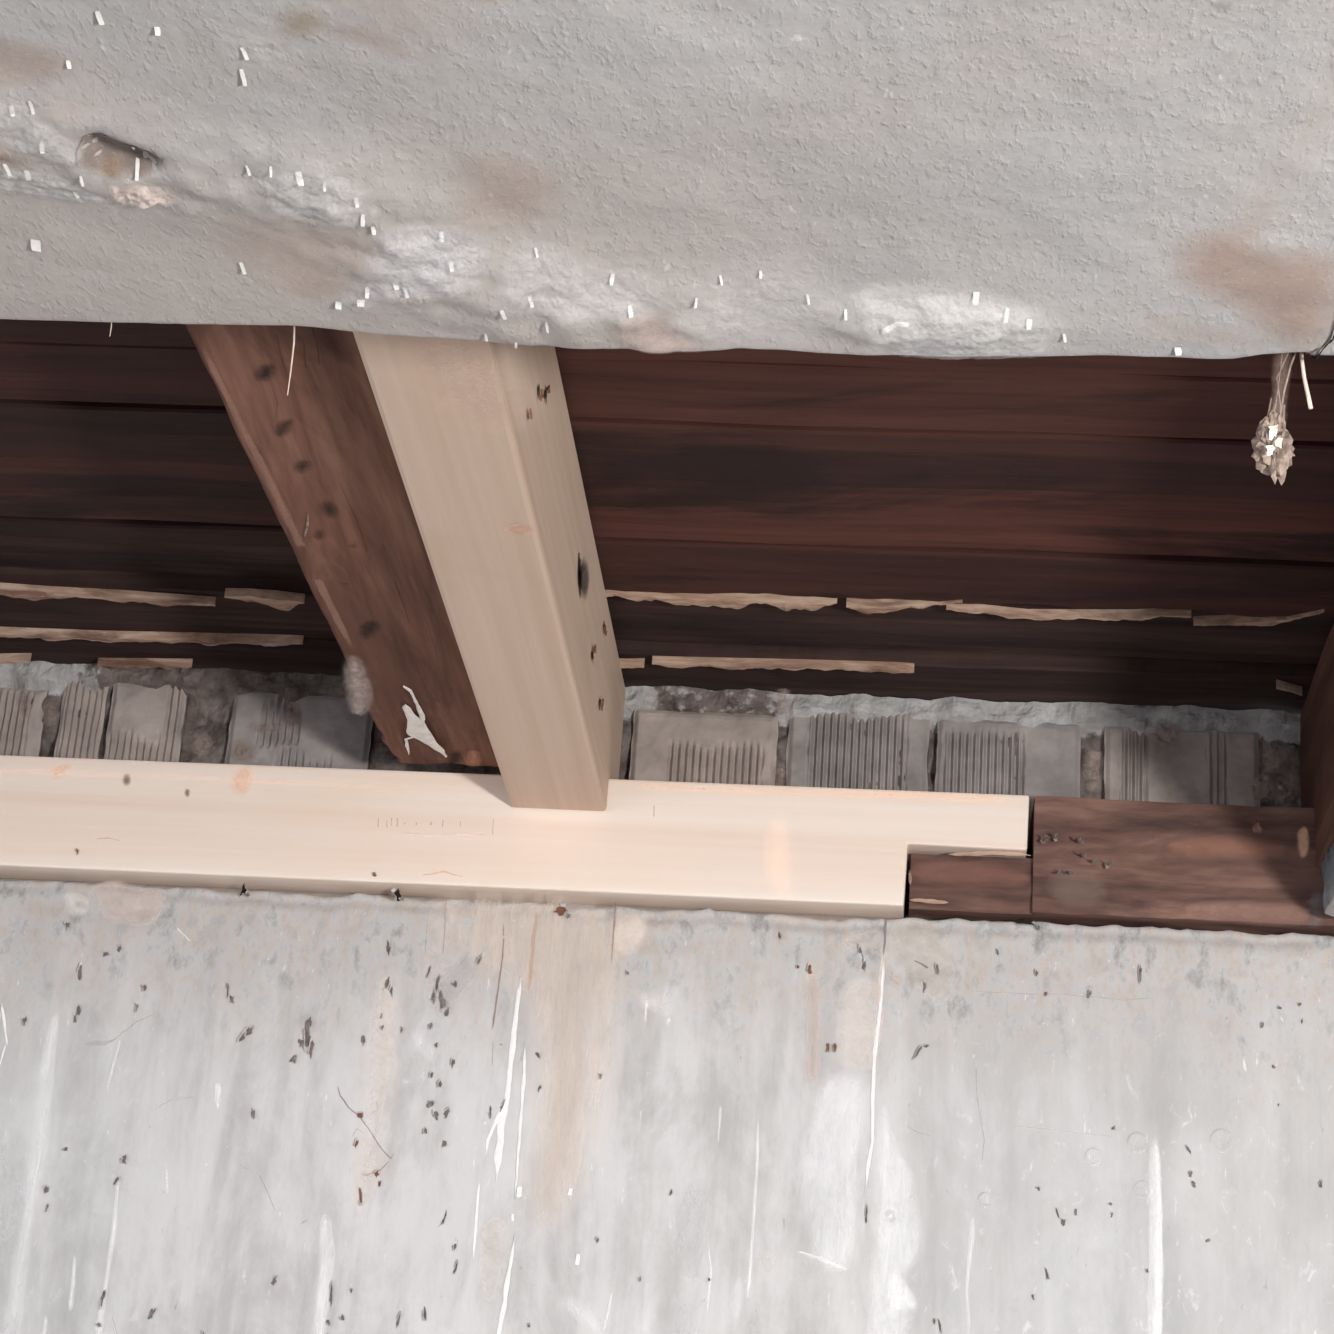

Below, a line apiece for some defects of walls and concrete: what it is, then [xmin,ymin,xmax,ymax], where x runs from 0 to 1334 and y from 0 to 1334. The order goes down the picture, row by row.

peeling [5,101,35,118]
spalling [0,133,163,207]
crack [1306,336,1334,360]